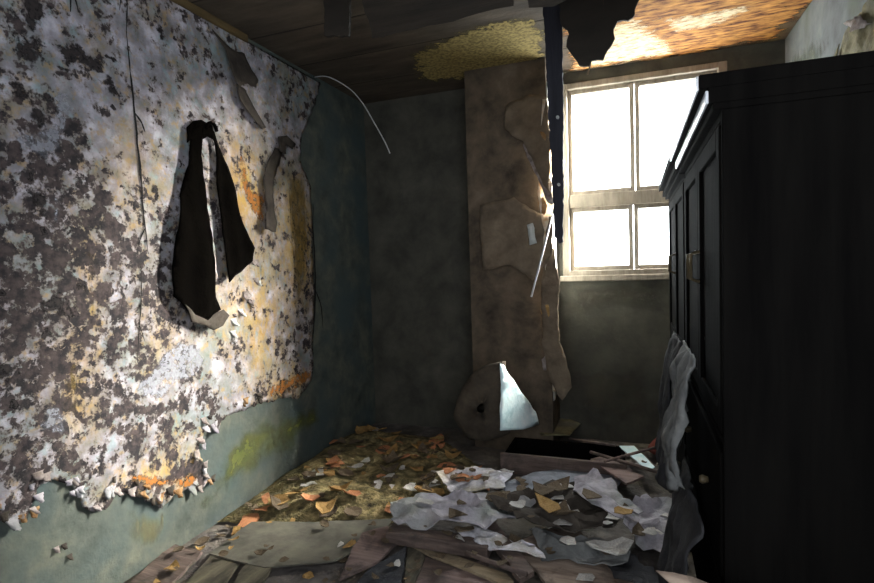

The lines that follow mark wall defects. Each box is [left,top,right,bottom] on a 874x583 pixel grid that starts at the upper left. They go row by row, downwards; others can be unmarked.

peeling [668,6,746,31]
damp [11,0,123,110]
peeling [591,20,671,65]
damp [5,81,46,128]
damp [33,192,47,215]
damp [38,292,79,340]
peeling [229,278,262,338]
damp [0,364,20,385]
peeling [0,469,52,531]
peeling [65,476,86,499]
peeling [92,415,219,511]
corrosion [132,475,196,487]